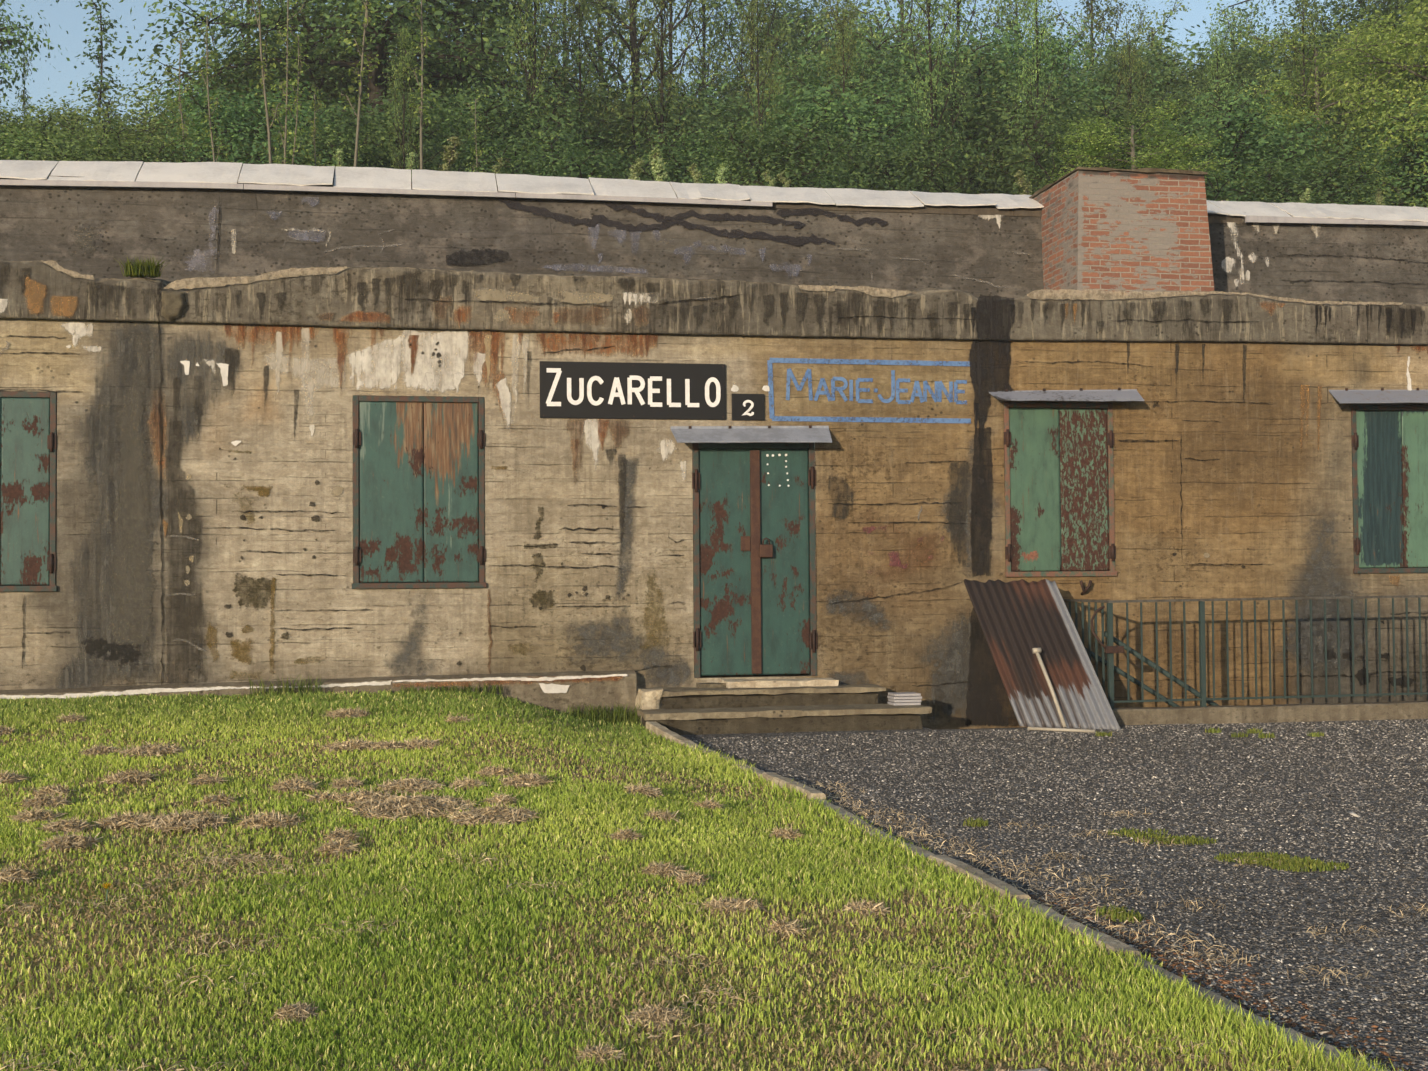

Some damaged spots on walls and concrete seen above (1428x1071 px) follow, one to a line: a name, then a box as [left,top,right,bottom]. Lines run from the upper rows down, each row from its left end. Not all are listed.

damp [235,290,286,314]
rust [225,311,389,437]
damp [56,282,239,689]
damp [943,427,997,576]